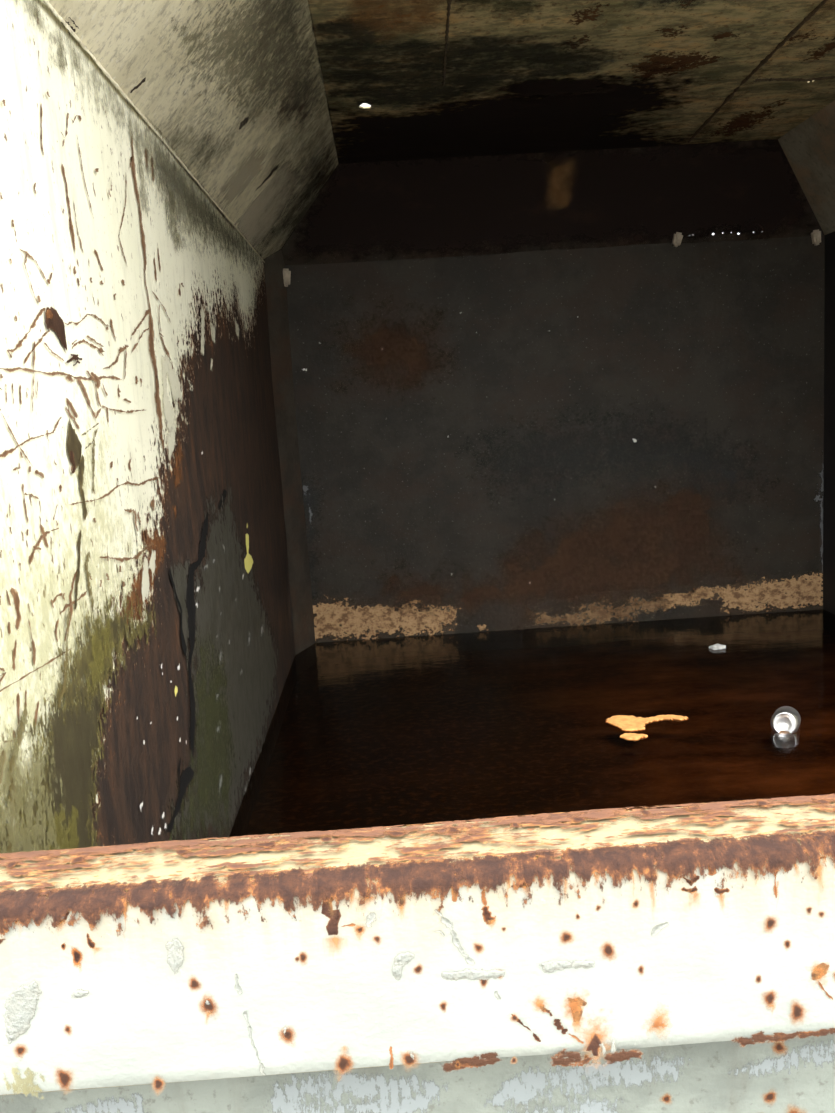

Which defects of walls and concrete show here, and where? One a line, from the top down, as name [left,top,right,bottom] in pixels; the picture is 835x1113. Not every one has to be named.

water stain [174,0,814,261]
crack [167,481,279,841]
water stain [47,608,113,850]
water stain [7,704,30,853]
corrosion [321,897,380,947]
corrosion [451,886,506,931]
corrosion [650,866,730,902]
corrosion [61,933,99,967]
corrosion [189,978,216,1017]
corrosion [535,997,642,1067]
corrosion [732,1003,835,1053]
corrosion [442,1052,517,1072]